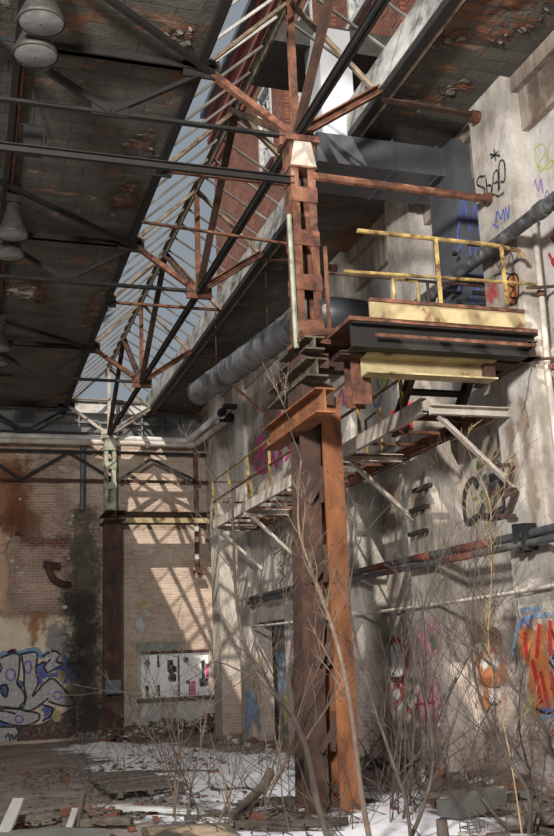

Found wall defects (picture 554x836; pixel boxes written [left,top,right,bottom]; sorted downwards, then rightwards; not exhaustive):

spalling [7,281,51,303]
water stain [61,505,103,740]